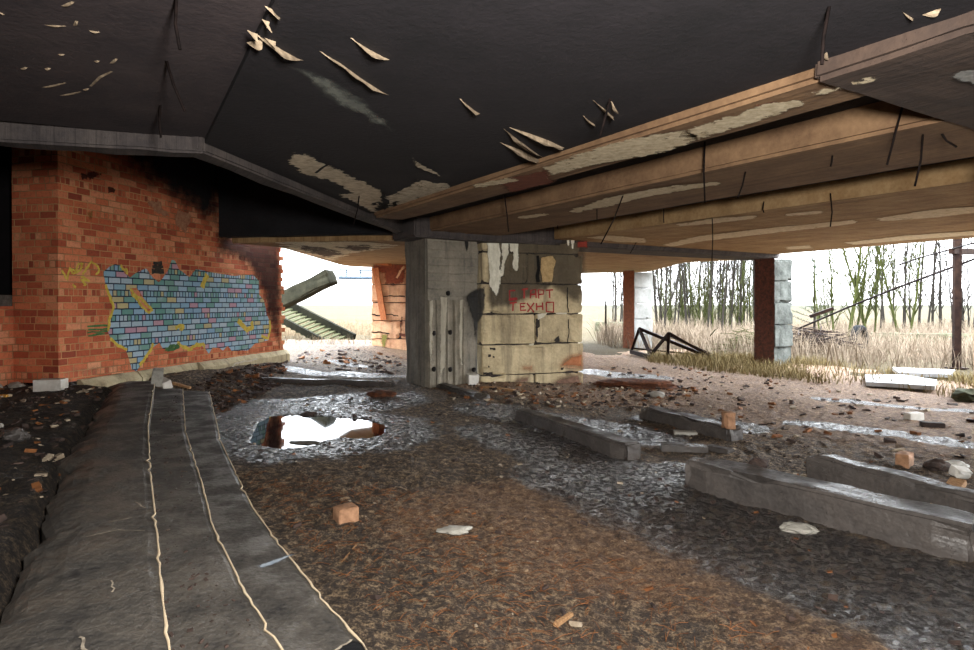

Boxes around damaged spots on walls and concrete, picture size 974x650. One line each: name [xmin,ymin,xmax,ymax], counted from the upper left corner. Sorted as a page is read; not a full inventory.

peeling [811,77,875,95]
peeling [500,98,803,203]
peeling [289,152,450,212]
peeling [472,177,519,232]